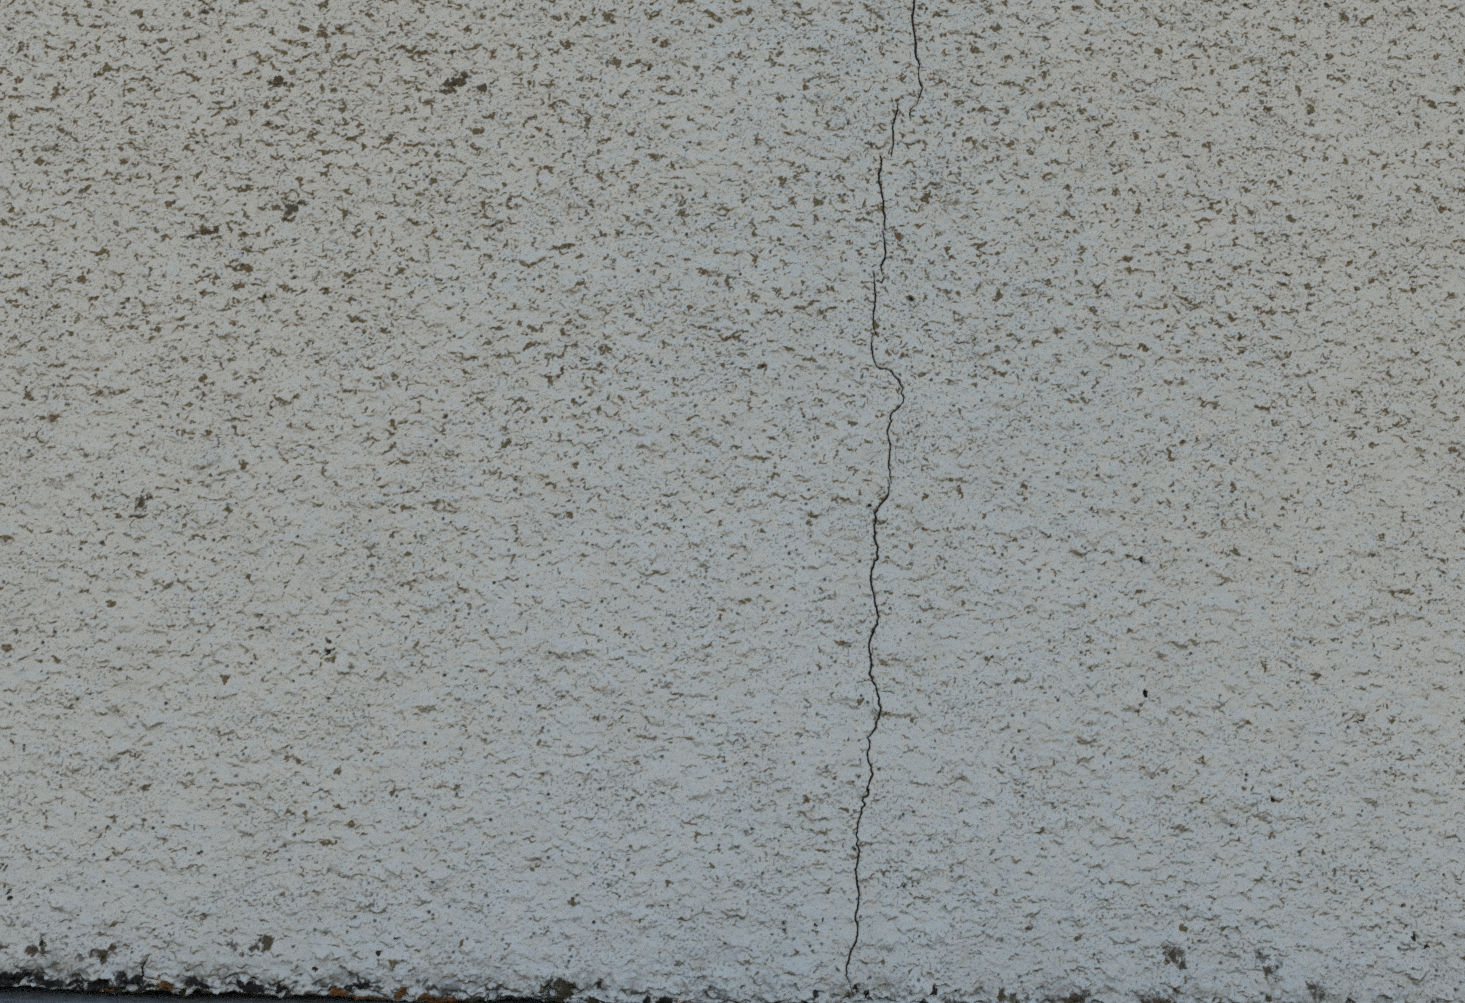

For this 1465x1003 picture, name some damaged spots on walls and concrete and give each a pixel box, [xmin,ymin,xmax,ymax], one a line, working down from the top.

crack [846,0,923,996]